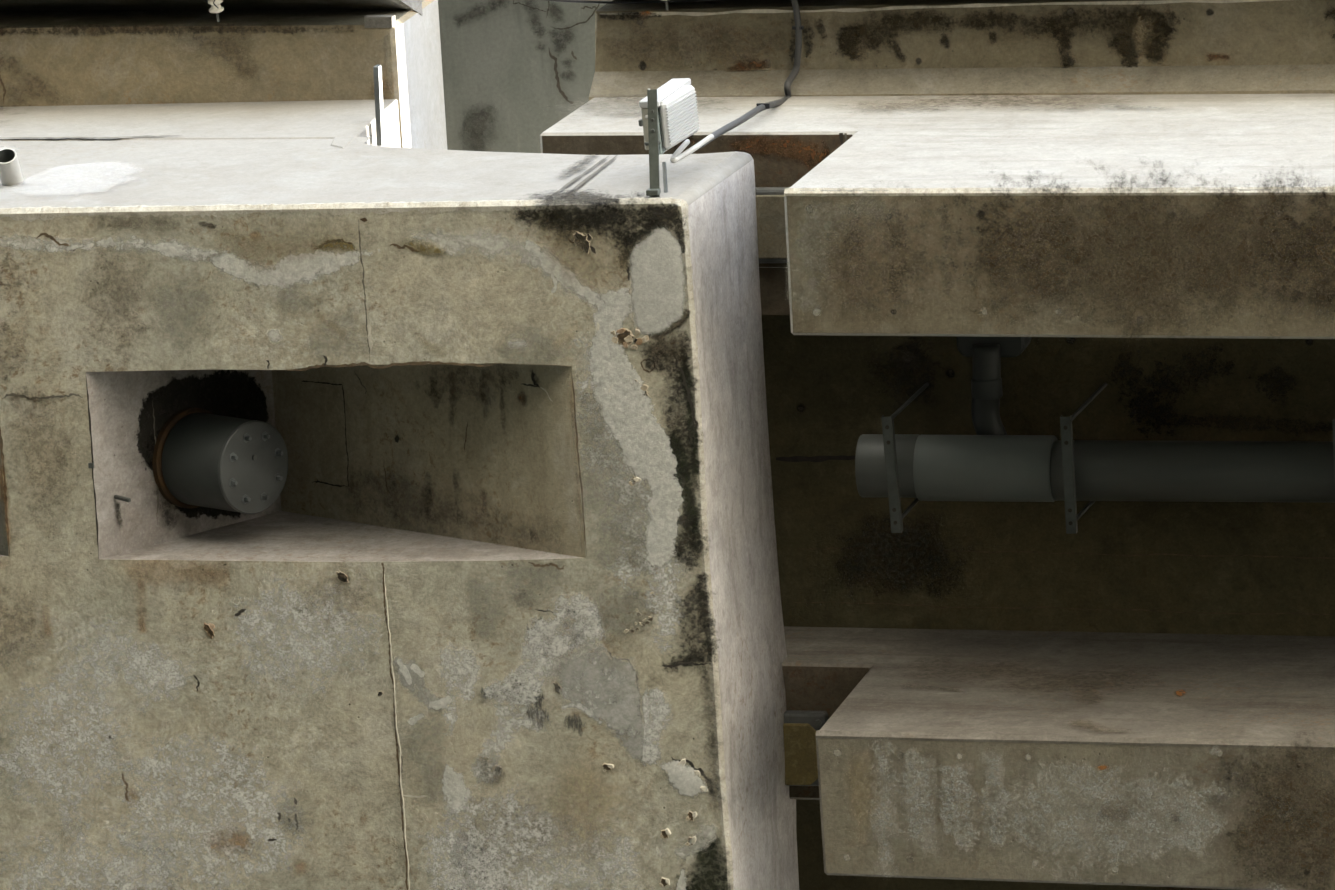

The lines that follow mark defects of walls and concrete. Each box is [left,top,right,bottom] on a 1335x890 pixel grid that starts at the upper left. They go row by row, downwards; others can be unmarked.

water stain [790,4,1180,68]
water stain [0,231,606,311]
spalling [568,231,596,255]
water stain [516,154,686,270]
water stain [573,337,715,667]
peeling [585,228,734,890]
water stain [872,740,1335,890]